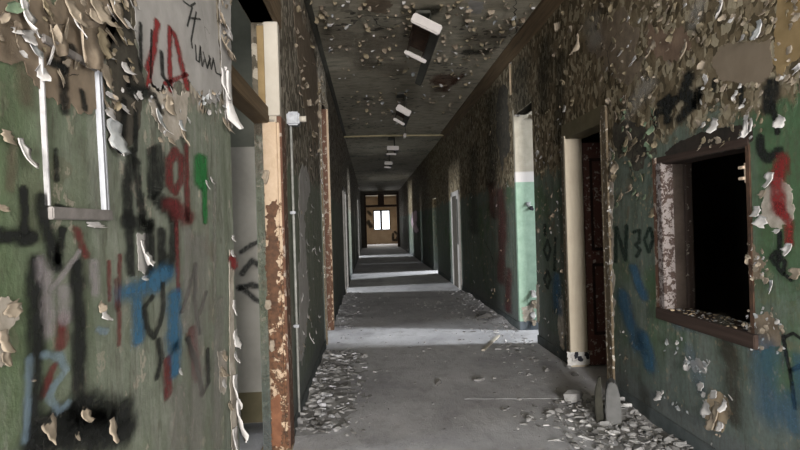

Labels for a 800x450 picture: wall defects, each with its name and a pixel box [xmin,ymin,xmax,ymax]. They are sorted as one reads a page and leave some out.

peeling [0,0,244,156]
peeling [422,0,535,114]
peeling [1,129,39,168]
peeling [292,0,420,361]
peeling [552,0,800,344]
peeling [0,296,23,367]
peeling [521,261,590,366]
flaking render [741,307,786,354]
peeling [41,413,57,445]
peeling [81,406,96,423]
peeling [109,417,119,443]
flaking render [664,337,733,446]